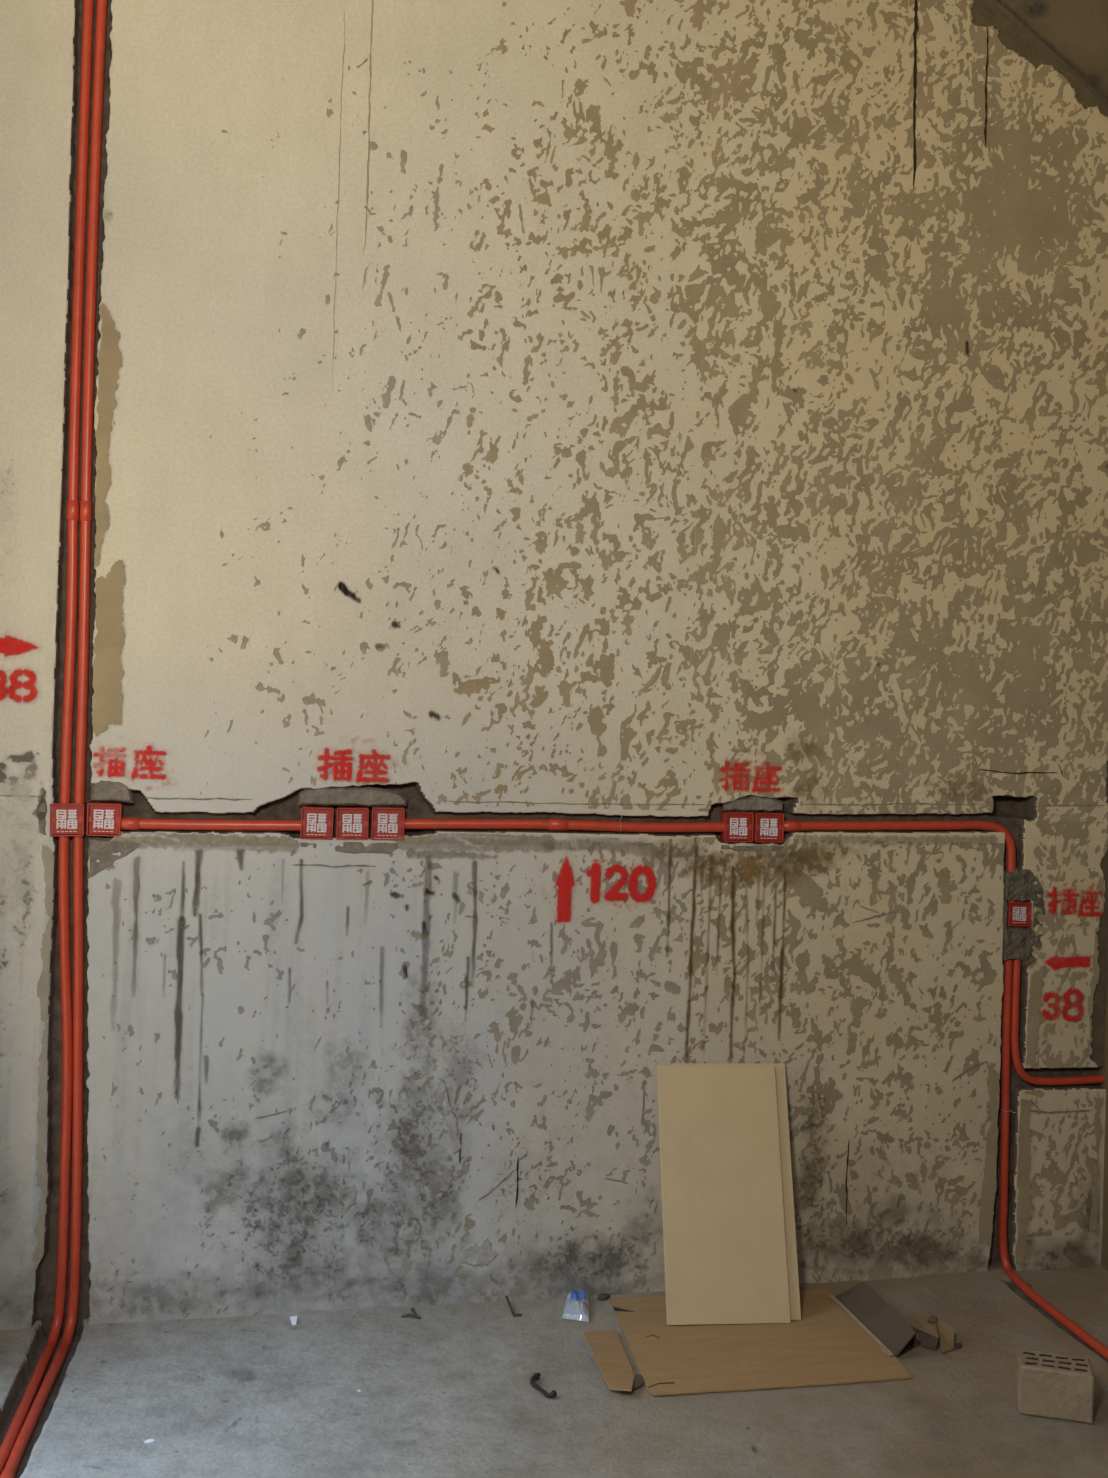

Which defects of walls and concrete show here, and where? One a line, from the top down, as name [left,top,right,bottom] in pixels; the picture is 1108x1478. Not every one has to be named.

crack [912,0,920,187]
crack [982,27,990,147]
peeling [92,303,126,737]
peeling [205,0,1108,1069]
water stain [175,850,202,1095]
water stain [245,1164,334,1286]